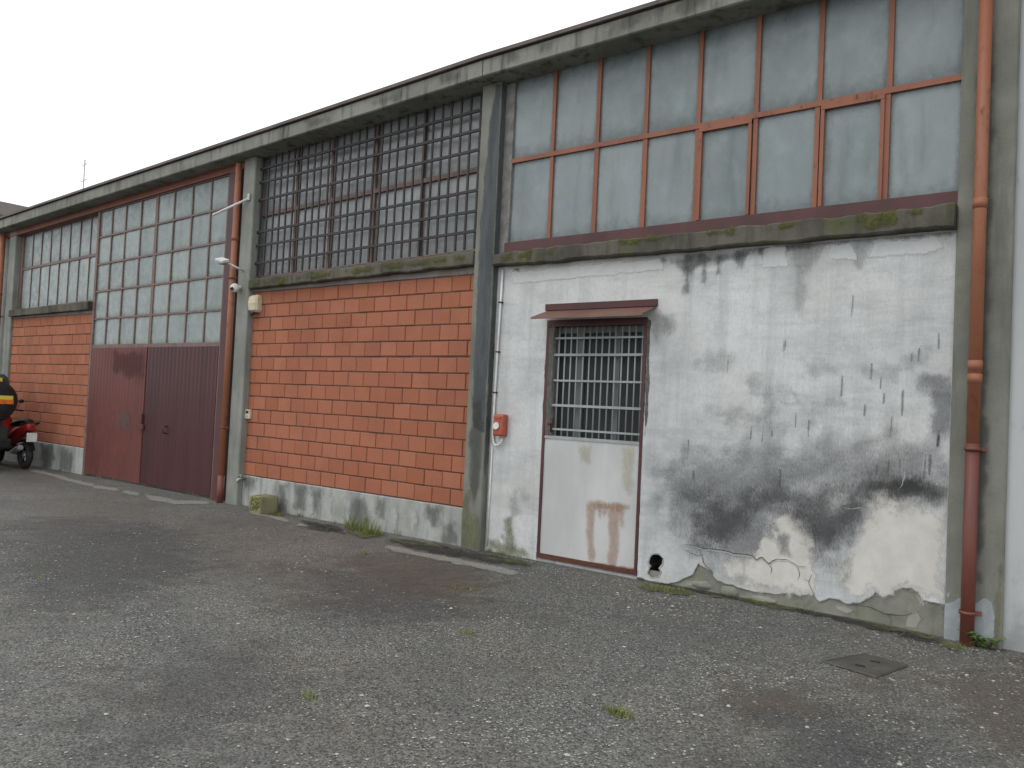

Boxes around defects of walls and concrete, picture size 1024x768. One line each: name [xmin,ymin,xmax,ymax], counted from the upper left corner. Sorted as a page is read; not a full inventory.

water stain [677,253,744,291]
water stain [868,479,941,498]
rust [538,501,634,572]
crack [685,545,813,592]
peeling [638,480,961,641]
peeling [974,587,995,641]